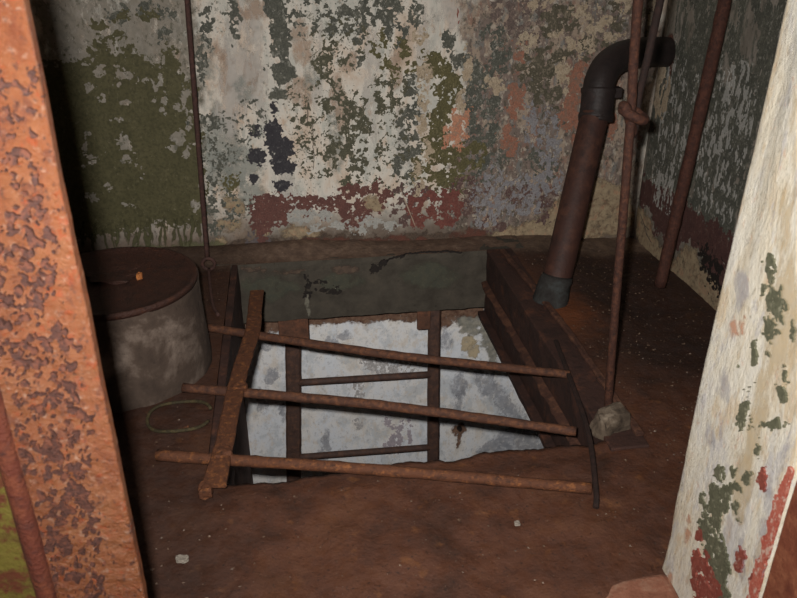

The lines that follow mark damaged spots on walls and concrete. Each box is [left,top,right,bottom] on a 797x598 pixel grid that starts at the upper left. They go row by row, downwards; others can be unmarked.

corrosion [0,60,115,598]
damp [33,0,279,251]
peeling [41,0,632,245]
damp [363,30,379,137]
crack [376,250,462,272]
peeling [581,0,718,260]
peeling [670,0,787,311]
peeling [690,382,795,598]
peeling [750,253,797,367]
peeling [774,364,790,404]